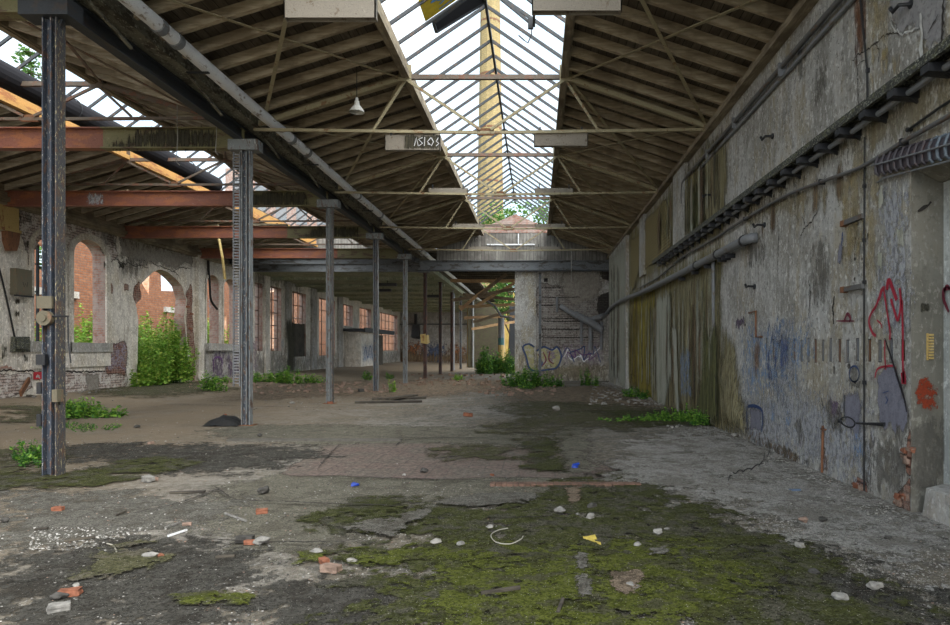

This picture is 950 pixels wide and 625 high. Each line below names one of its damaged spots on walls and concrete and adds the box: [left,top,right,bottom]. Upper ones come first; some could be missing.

damp [685,143,719,232]
flaking render [0,354,33,399]
flaking render [66,341,128,392]
flaking render [186,284,195,381]
flaking render [536,271,609,349]
damp [542,242,716,423]
flaking render [893,429,916,511]